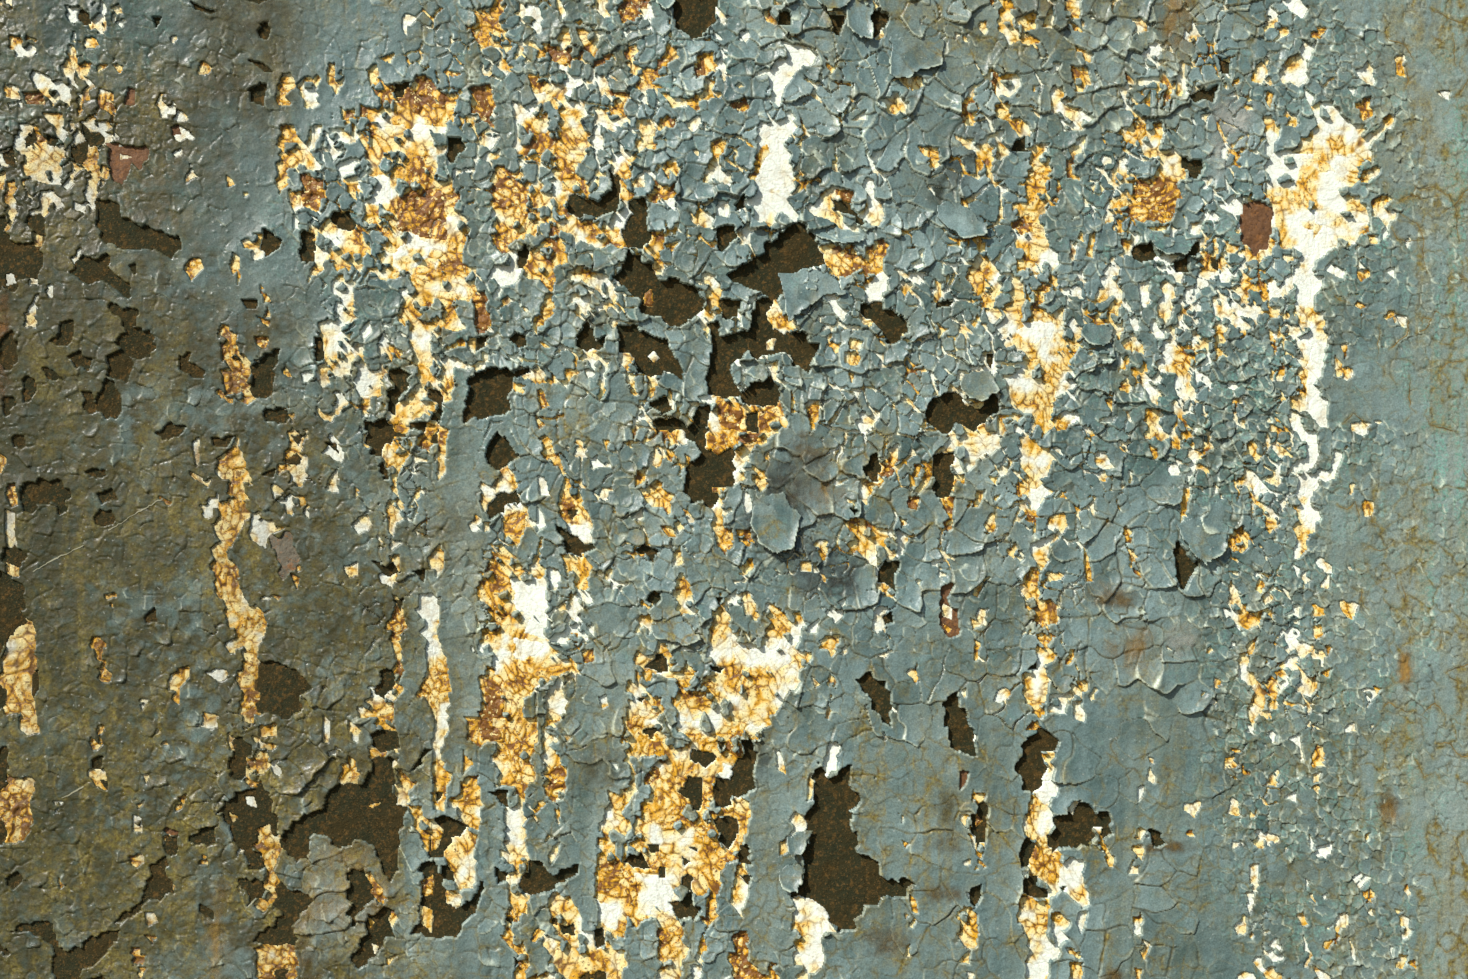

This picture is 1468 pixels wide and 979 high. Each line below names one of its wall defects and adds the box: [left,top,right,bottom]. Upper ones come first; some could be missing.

peeling [249,60,344,109]
peeling [0,0,205,419]
peeling [229,229,282,285]
crack [1377,310,1443,357]
peeling [0,435,71,735]
peeling [216,324,345,518]
peeling [276,0,1401,979]
crack [1338,501,1411,611]
peeling [189,436,484,979]
rust [1399,655,1411,682]
peeling [0,746,35,845]
peeling [11,827,178,979]